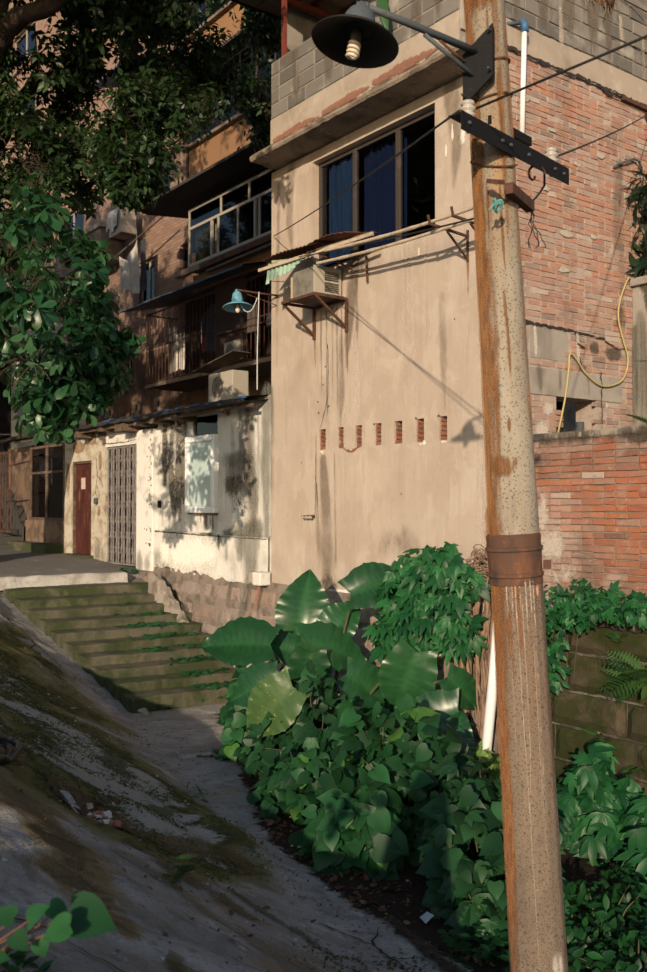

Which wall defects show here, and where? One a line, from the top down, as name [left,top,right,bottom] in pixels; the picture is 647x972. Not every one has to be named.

rust [463,0,507,47]
rust [497,65,513,138]
rust [467,134,517,546]
crack [525,319,647,423]
leakage [162,421,188,522]
leakage [225,472,246,516]
rust [491,585,522,970]
crack [319,922,420,972]